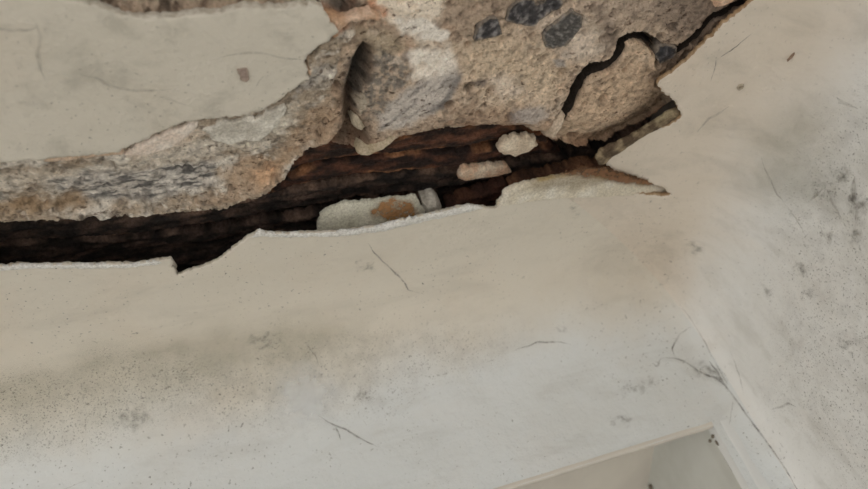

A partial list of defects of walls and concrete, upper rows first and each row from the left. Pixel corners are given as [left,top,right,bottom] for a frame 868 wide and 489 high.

spalling [0,0,743,223]
crack [558,31,657,120]
crack [676,0,747,52]
crack [658,329,776,454]